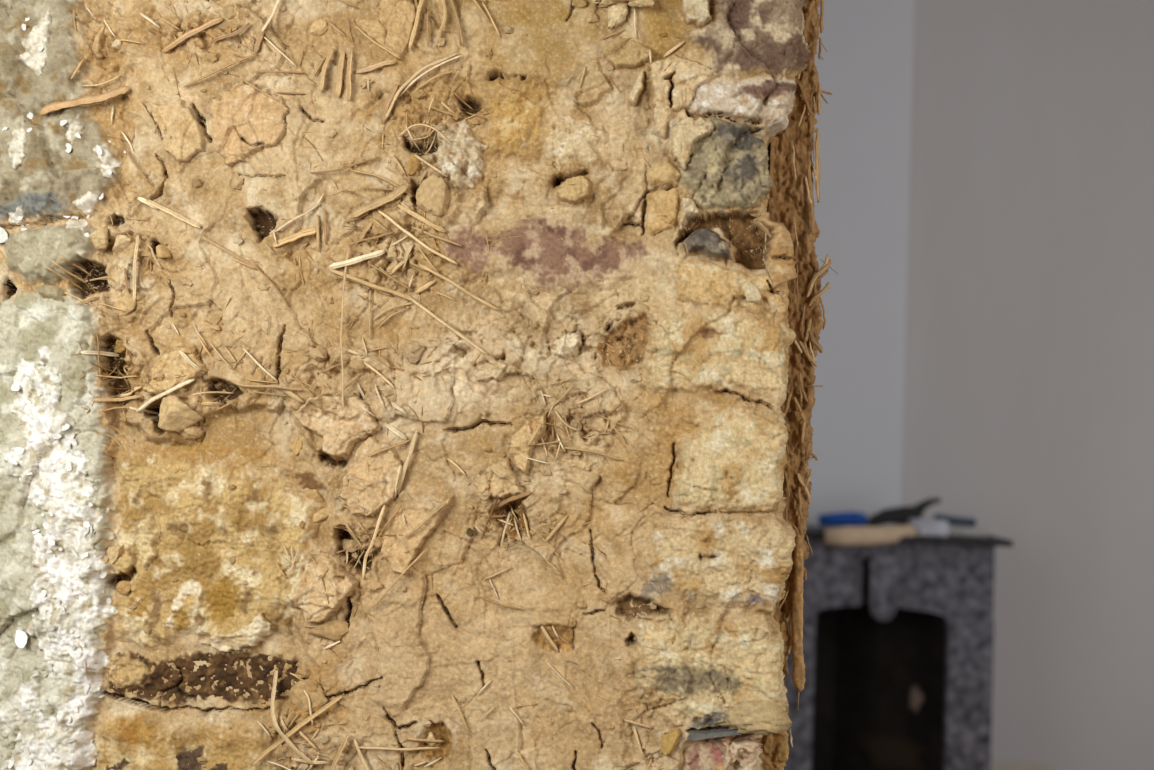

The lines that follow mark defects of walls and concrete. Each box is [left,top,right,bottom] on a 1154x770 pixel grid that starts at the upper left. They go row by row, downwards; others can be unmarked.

crack [151,115,168,201]
crack [192,103,265,147]
spalling [429,0,812,296]
crack [145,279,175,356]
crack [275,325,286,385]
crack [443,419,512,433]
flaking render [545,305,796,770]
crack [436,593,458,628]
spalling [528,621,578,655]
crack [572,529,607,648]
crack [93,667,271,715]
crack [325,677,417,770]